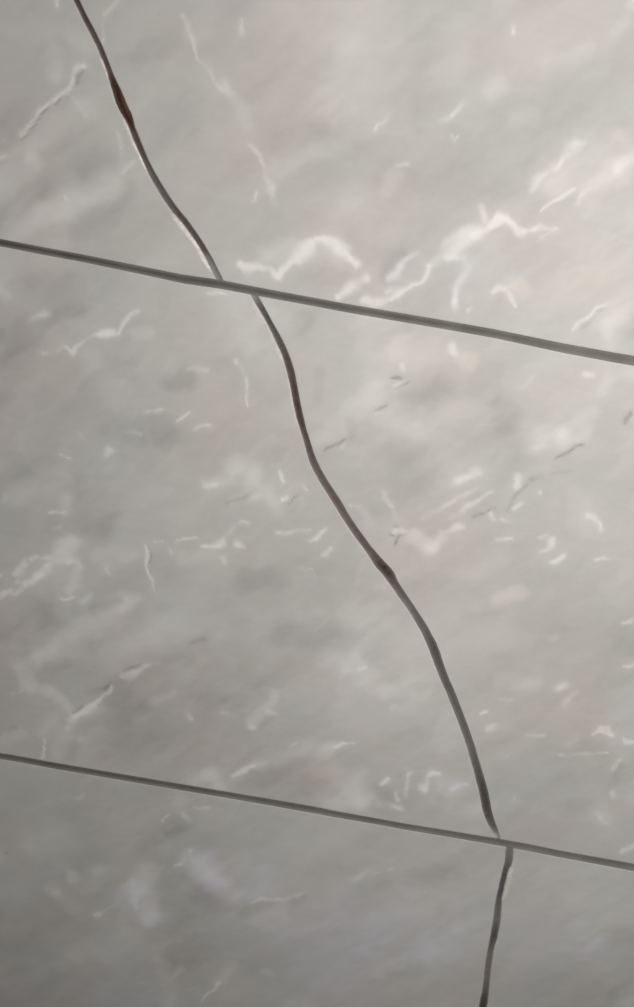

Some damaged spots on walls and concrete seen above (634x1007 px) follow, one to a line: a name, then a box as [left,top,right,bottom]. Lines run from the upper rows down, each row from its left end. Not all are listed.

crack [74,0,223,281]
crack [251,295,514,1007]